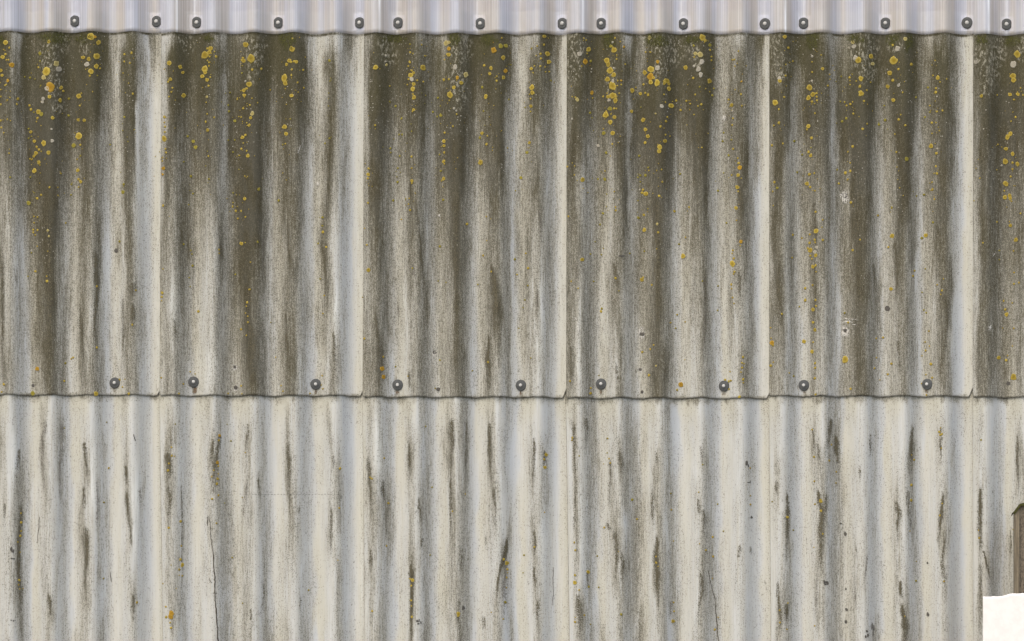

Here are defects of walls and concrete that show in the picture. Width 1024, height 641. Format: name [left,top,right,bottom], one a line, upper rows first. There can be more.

water stain [78,252,100,359]
water stain [10,506,24,633]
water stain [82,482,100,589]
crack [207,517,219,641]
water stain [408,564,421,640]
water stain [448,420,468,569]
water stain [495,537,510,615]
water stain [651,491,672,614]
water stain [815,490,829,614]
water stain [899,580,909,641]
water stain [927,493,946,584]
water stain [977,488,993,634]